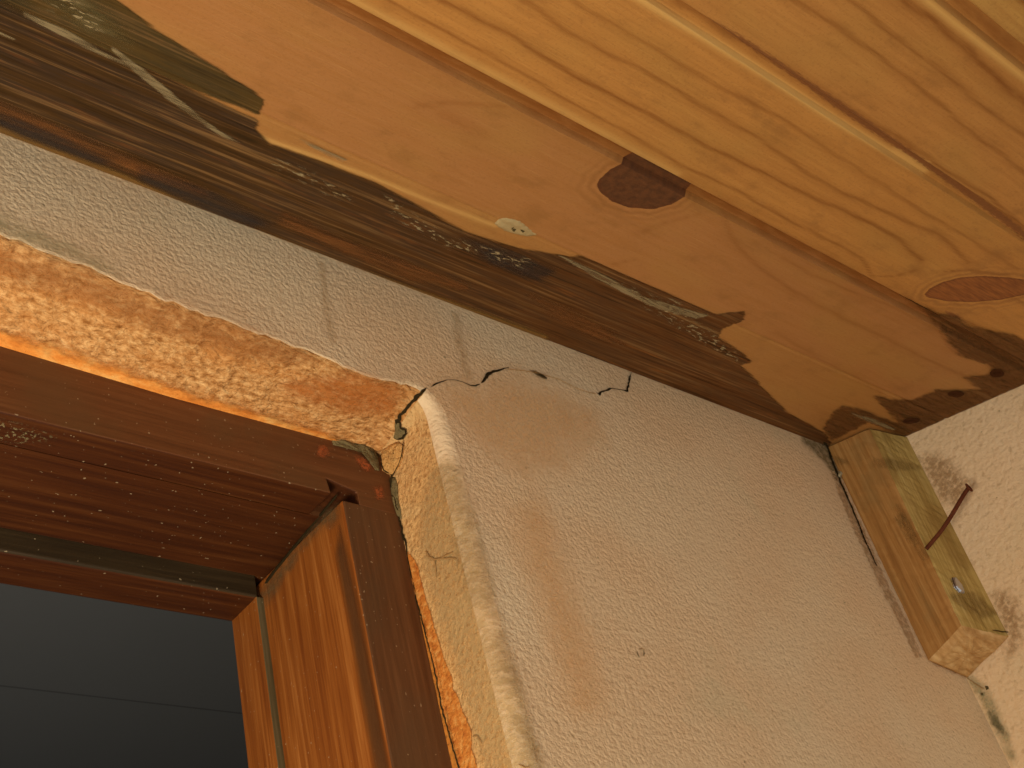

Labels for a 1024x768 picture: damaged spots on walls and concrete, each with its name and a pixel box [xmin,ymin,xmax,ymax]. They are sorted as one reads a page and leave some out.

leakage [0,0,1024,446]
crack [395,367,632,424]
mould [965,676,1013,757]